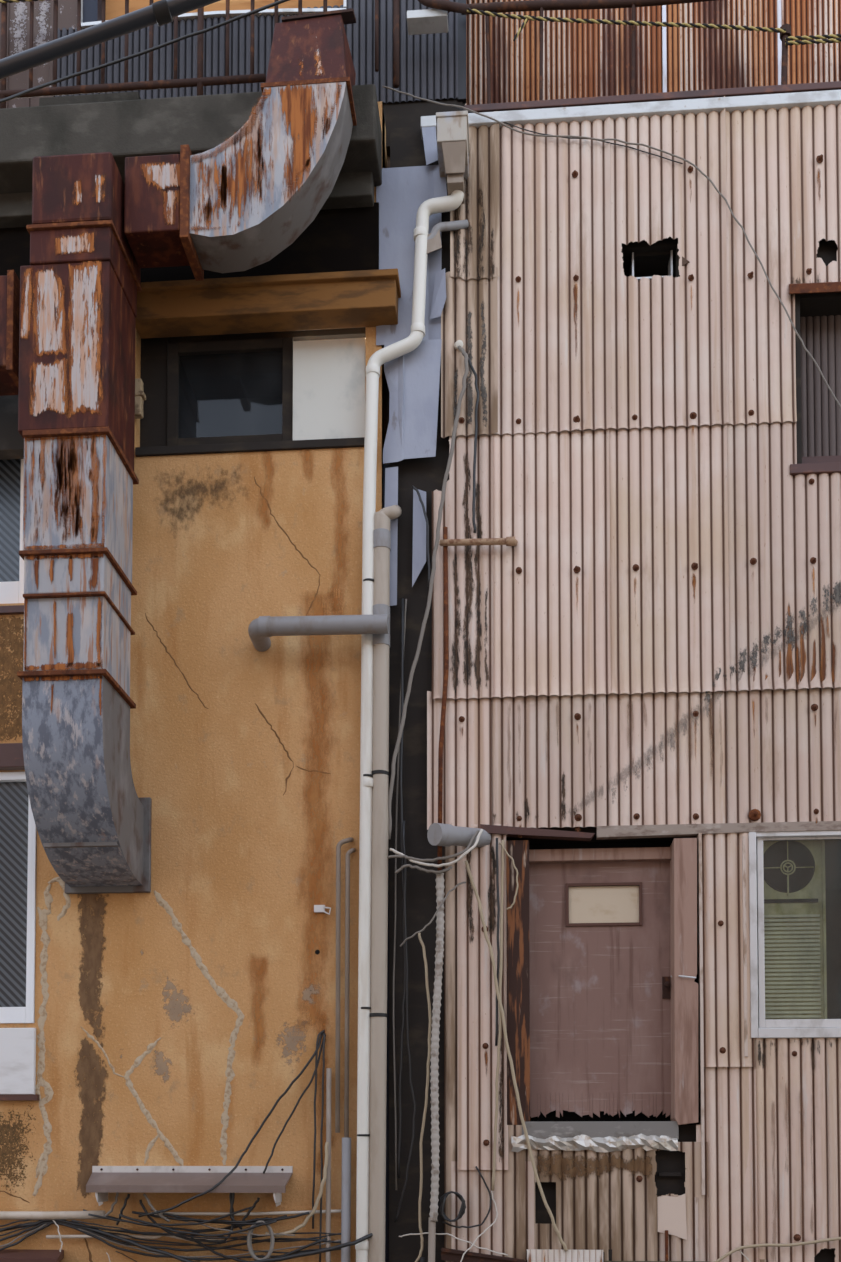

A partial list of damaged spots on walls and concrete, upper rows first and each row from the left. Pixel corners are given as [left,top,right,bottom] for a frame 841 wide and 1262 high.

corrosion [72,175,105,205]
corrosion [142,52,342,231]
corrosion [21,231,104,417]
corrosion [23,434,106,716]
crack [254,477,320,615]
corrosion [753,605,835,684]
crack [255,704,331,795]
leakage [0,1105,36,1192]
crack [0,877,71,1203]
leakage [76,893,108,1198]
crack [81,1027,183,1166]
crack [154,890,244,1165]